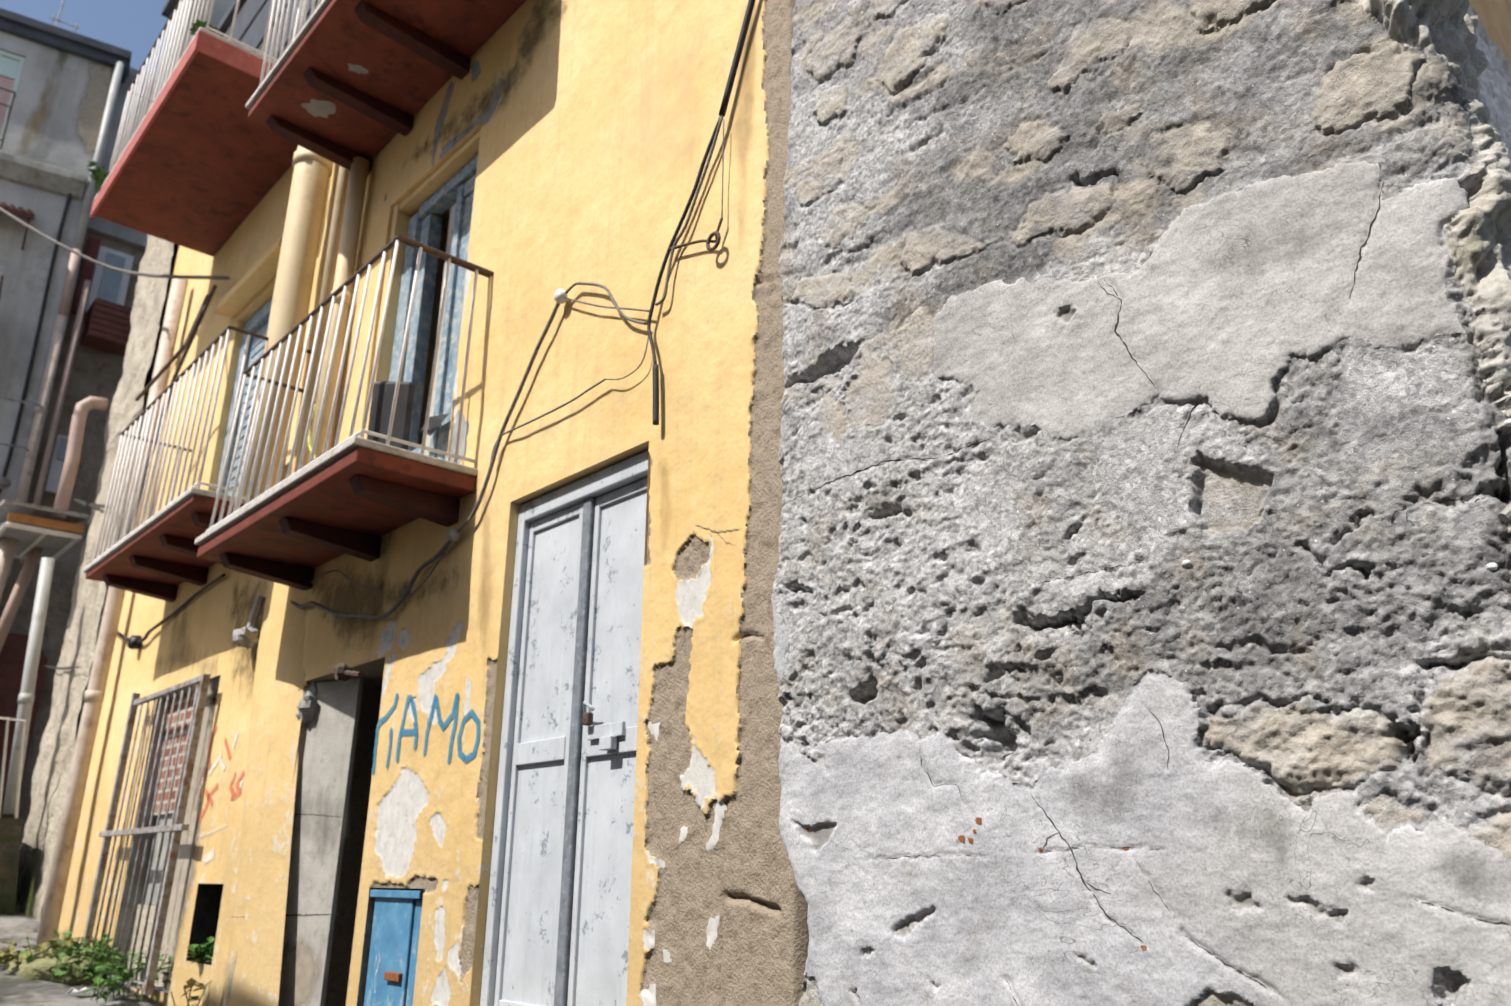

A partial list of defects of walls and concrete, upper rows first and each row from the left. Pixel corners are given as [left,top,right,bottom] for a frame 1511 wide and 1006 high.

crack [1349,181,1384,298]
crack [1098,280,1159,391]
spalling [639,0,1511,1006]
peeling [371,766,479,1006]
crack [1030,793,1143,942]